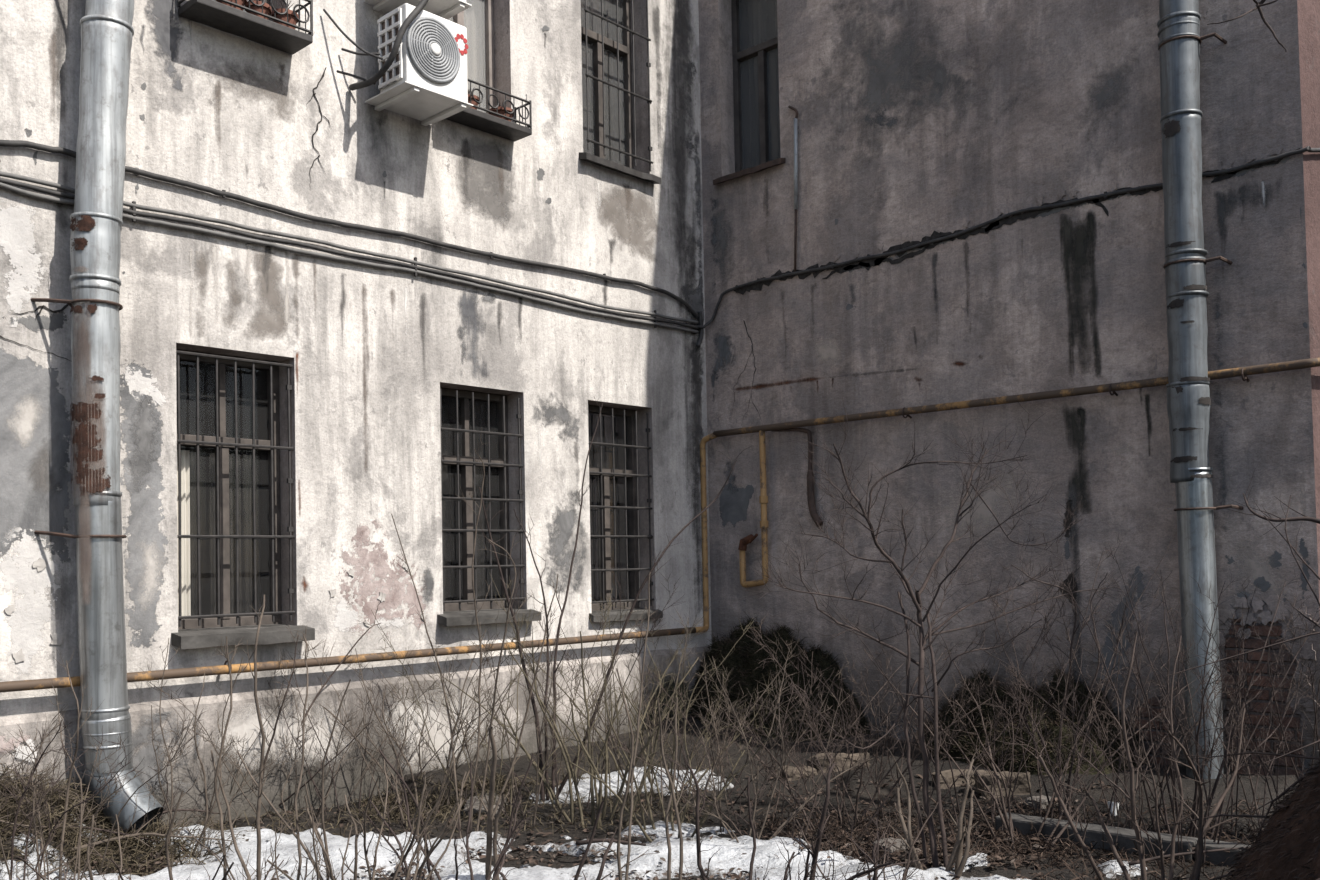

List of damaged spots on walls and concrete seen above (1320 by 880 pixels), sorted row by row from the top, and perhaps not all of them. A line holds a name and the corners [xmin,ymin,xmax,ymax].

crack [306,67,332,179]
crack [1202,148,1300,183]
crack [0,304,70,361]
crack [731,186,1163,422]
leakage [1060,212,1101,375]
peeling [0,527,62,674]
peeling [31,450,51,490]
peeling [329,521,434,635]
spalling [719,462,754,527]
leakage [1065,408,1089,684]
flaking render [1218,538,1320,778]